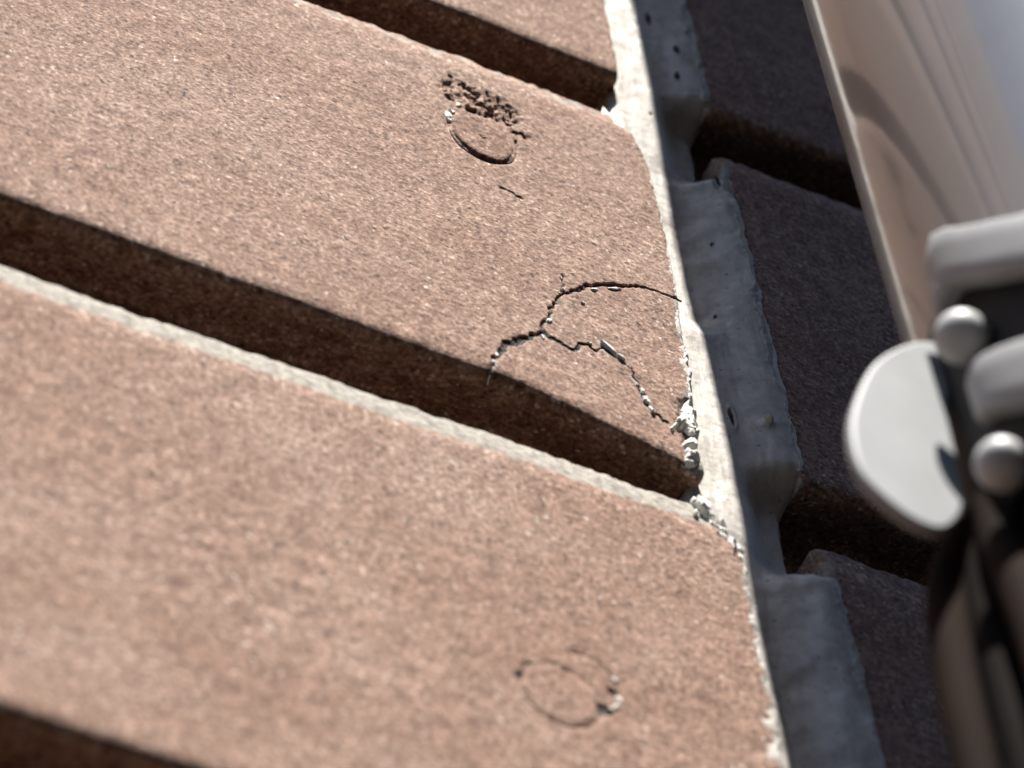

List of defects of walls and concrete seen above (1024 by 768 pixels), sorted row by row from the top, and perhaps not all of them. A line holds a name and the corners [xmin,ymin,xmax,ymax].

spalling [445,76,524,164]
crack [484,276,682,422]